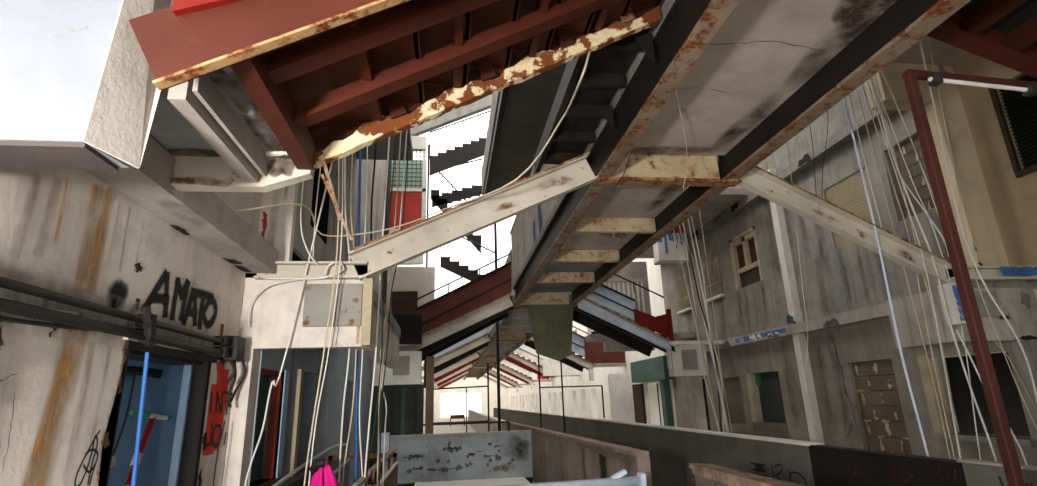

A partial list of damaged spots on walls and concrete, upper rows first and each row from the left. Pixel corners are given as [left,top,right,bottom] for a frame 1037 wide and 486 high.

crack [716,41,822,50]
damp [834,0,892,47]
damp [723,128,745,141]
corrosion [77,186,112,291]
corrosion [24,347,73,486]
peeling [403,439,527,474]